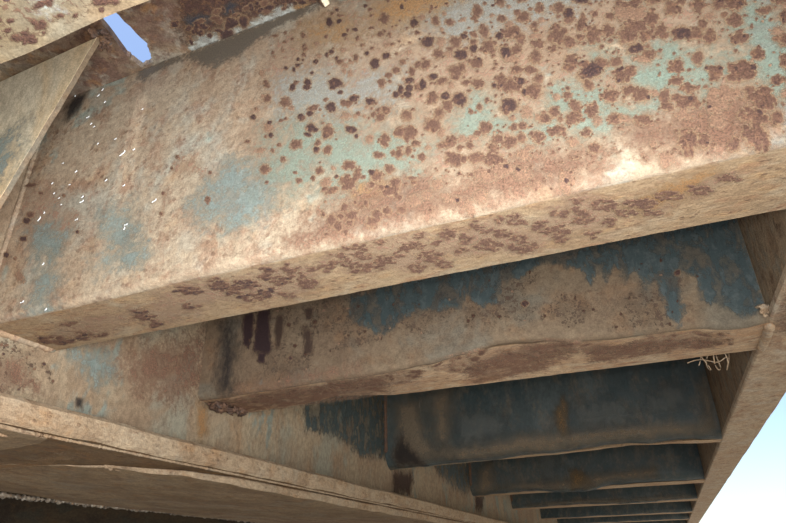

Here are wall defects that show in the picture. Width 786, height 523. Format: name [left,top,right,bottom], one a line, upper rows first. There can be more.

rust [0,0,120,47]
rust [19,181,82,247]
rust [35,0,786,437]
rust [1,248,26,284]
rust [0,340,54,393]